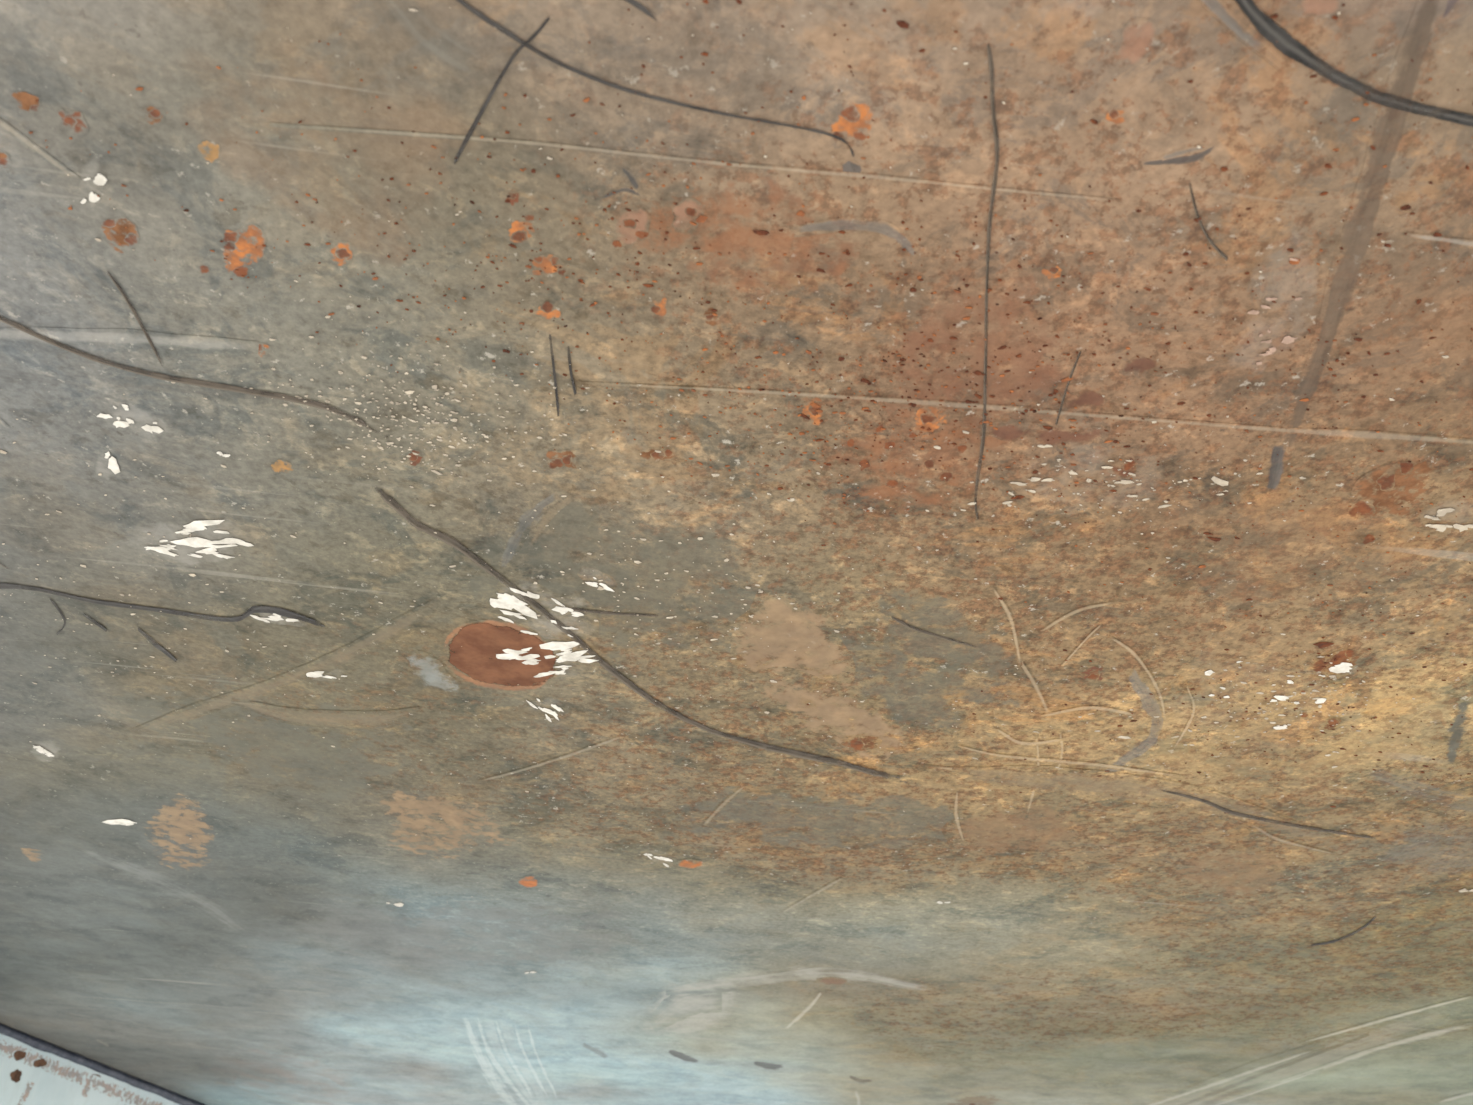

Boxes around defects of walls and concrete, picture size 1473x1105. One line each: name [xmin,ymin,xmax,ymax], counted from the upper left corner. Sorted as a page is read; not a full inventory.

rust [11,91,89,134]
rust [138,33,494,278]
rust [502,189,566,276]
crack [454,0,854,164]
crack [1199,0,1473,127]
water stain [1261,0,1462,492]
crack [0,272,388,437]
crack [0,563,325,662]
rust [407,619,558,694]
crack [376,489,906,783]
water stain [1360,672,1473,883]
rust [0,1039,166,1105]